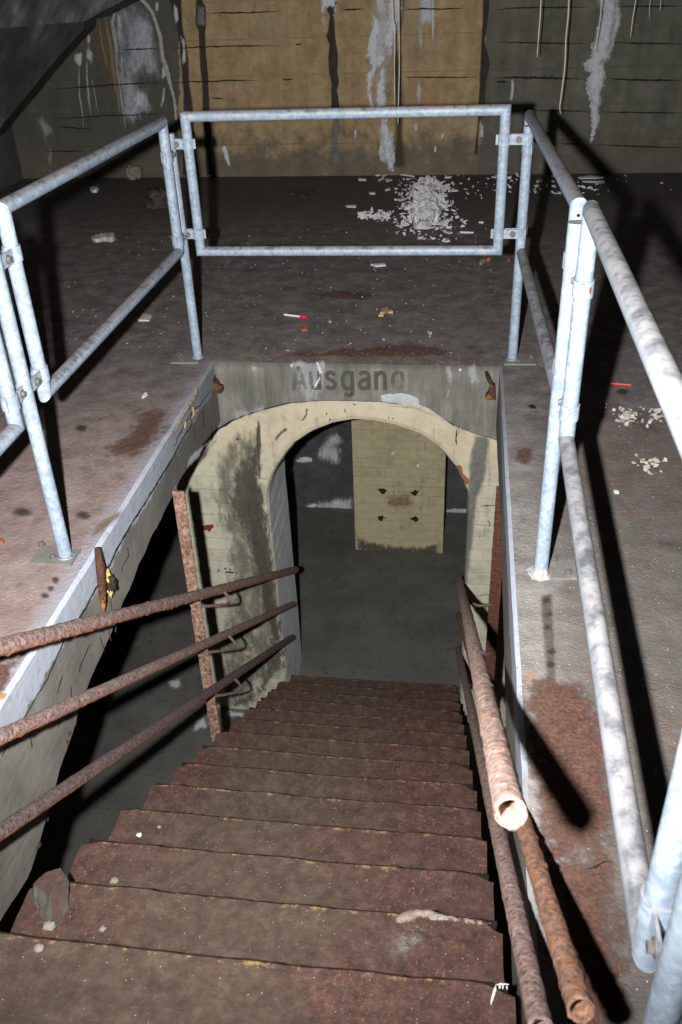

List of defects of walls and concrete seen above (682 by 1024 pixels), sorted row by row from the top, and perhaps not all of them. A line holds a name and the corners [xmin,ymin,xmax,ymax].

leakage [118,0,230,175]
leakage [321,0,340,164]
leakage [366,0,417,171]
leakage [420,0,434,44]
leakage [583,0,619,143]
corrosion [106,411,167,455]
spalling [381,393,452,426]
leakage [220,422,286,716]
corrosion [0,662,14,699]
corrosion [524,675,629,1024]